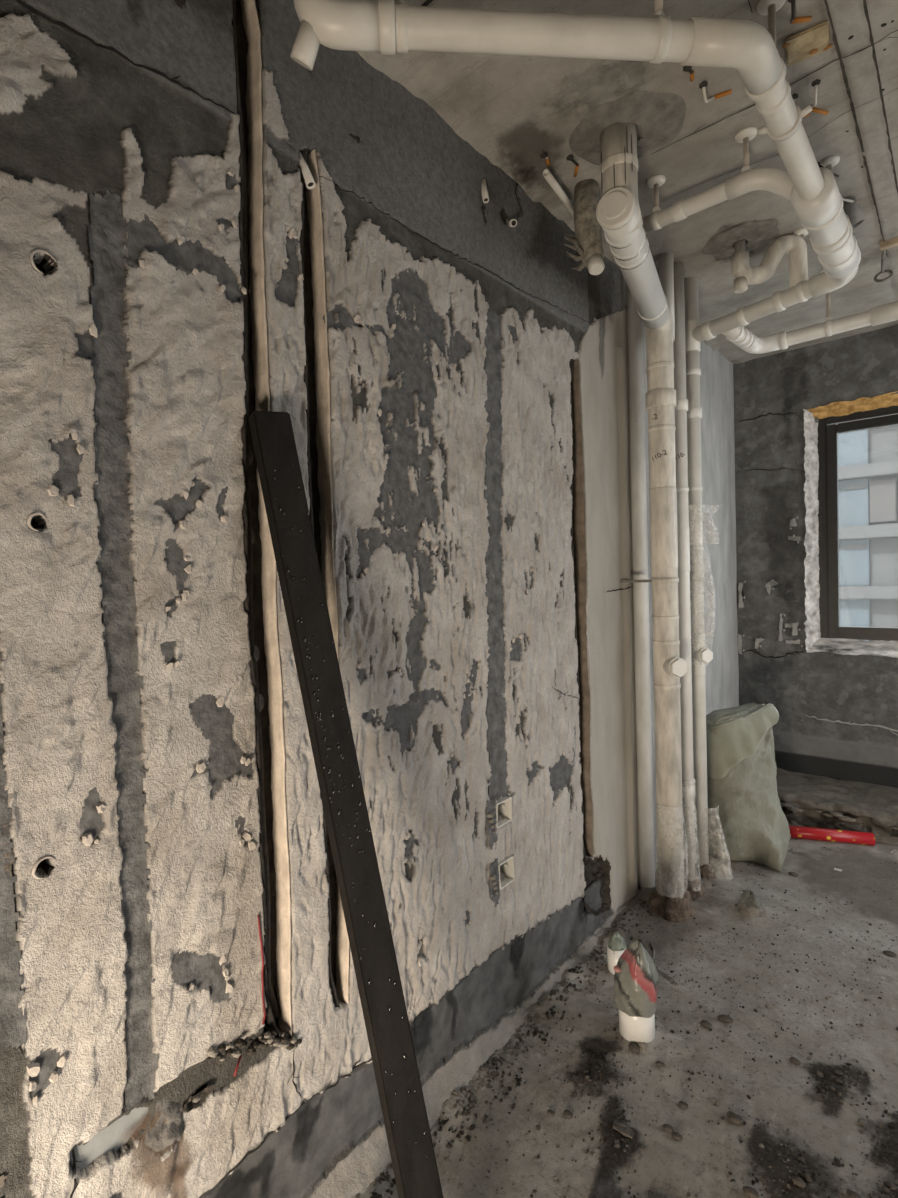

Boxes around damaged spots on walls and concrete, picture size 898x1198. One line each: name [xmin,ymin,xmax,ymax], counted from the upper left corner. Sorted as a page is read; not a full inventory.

spalling [47,432,85,507]
spalling [154,478,228,618]
spalling [322,268,471,755]
spalling [160,641,180,671]
spalling [510,634,525,666]
spalling [460,659,481,738]
spalling [189,694,254,799]
spalling [526,751,575,805]
spalling [403,830,417,856]
spalling [486,799,500,907]
spalling [583,855,611,915]
rust [131,1117,190,1198]